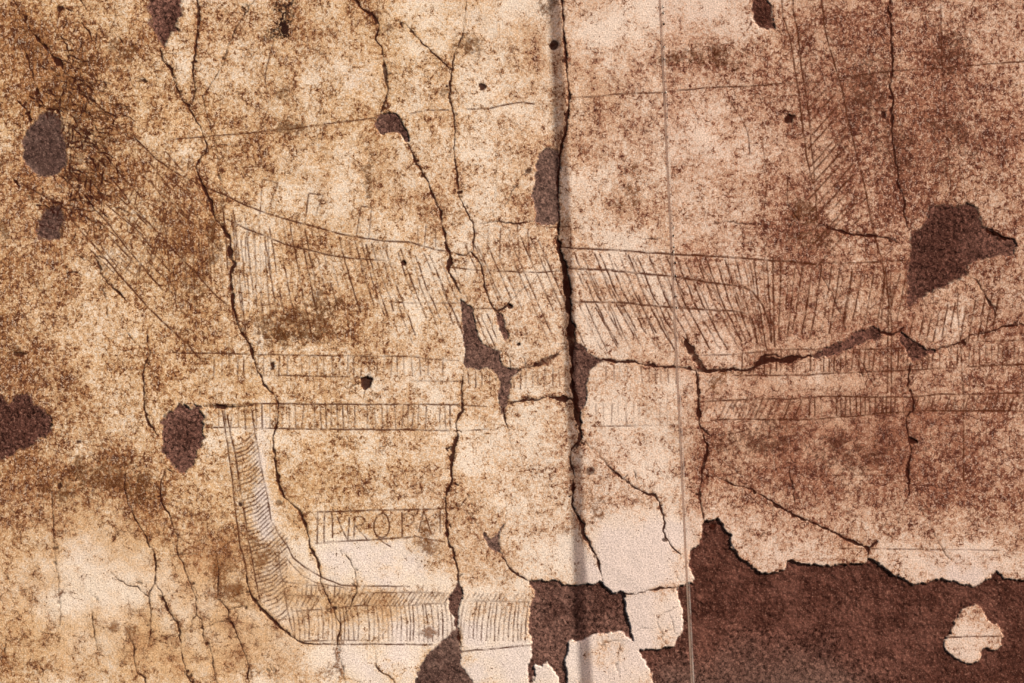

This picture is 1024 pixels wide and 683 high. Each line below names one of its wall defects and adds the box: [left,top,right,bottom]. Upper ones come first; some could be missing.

spalling [144,0,186,50]
spalling [523,146,563,228]
crack [0,0,396,683]
spalling [458,295,524,416]
crack [351,0,999,602]
spalling [903,200,1019,312]
crack [937,271,1024,351]
spalling [0,390,55,462]
spalling [158,399,255,476]
spalling [411,579,475,683]
crack [599,635,636,683]
spalling [525,516,1024,683]